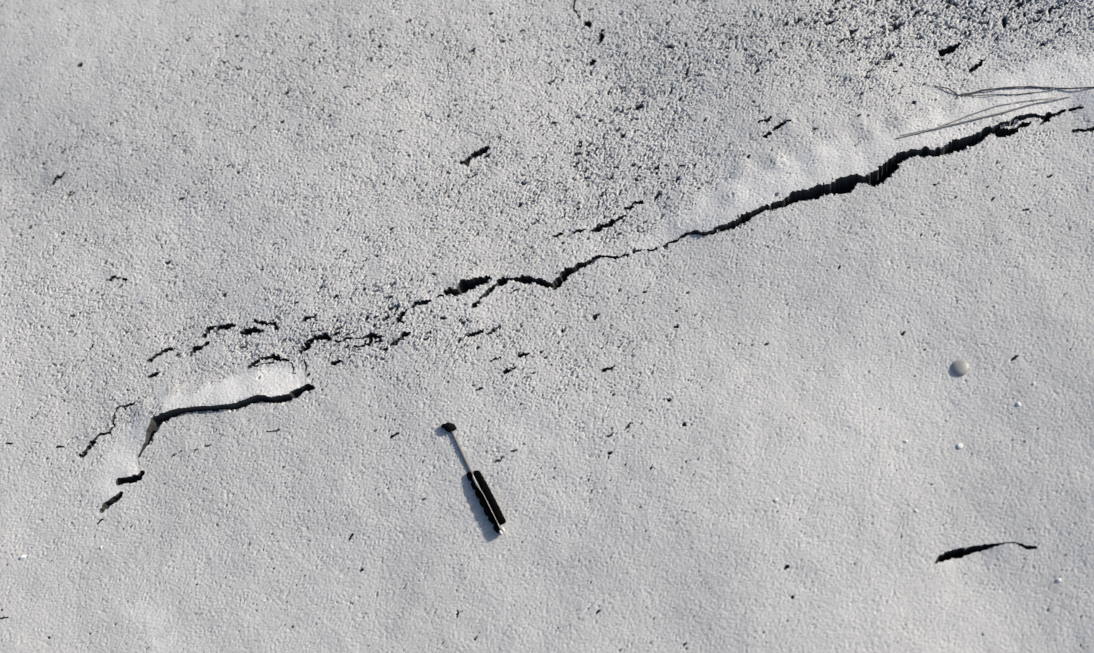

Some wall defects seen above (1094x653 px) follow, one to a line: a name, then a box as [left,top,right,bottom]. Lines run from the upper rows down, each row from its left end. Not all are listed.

crack [573,0,605,66]
crack [936,42,986,73]
crack [56,106,1094,524]
crack [935,542,1038,564]